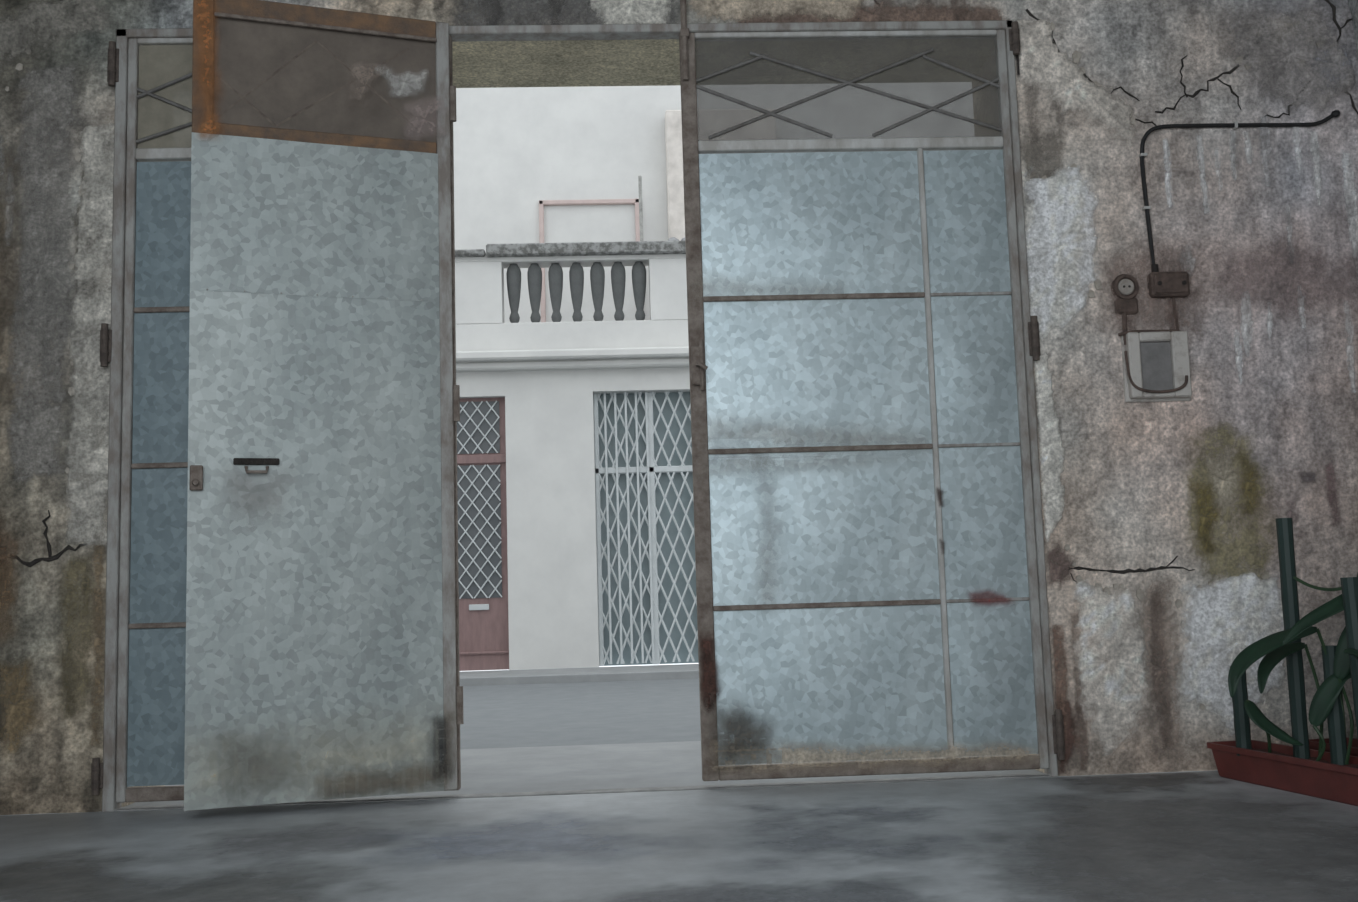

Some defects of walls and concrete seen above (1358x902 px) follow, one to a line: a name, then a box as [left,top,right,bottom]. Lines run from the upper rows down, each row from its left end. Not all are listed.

flaking render [690,0,863,20]
corrosion [354,65,423,97]
crack [1026,0,1358,126]
water stain [1196,455,1257,551]
crack [9,510,94,567]